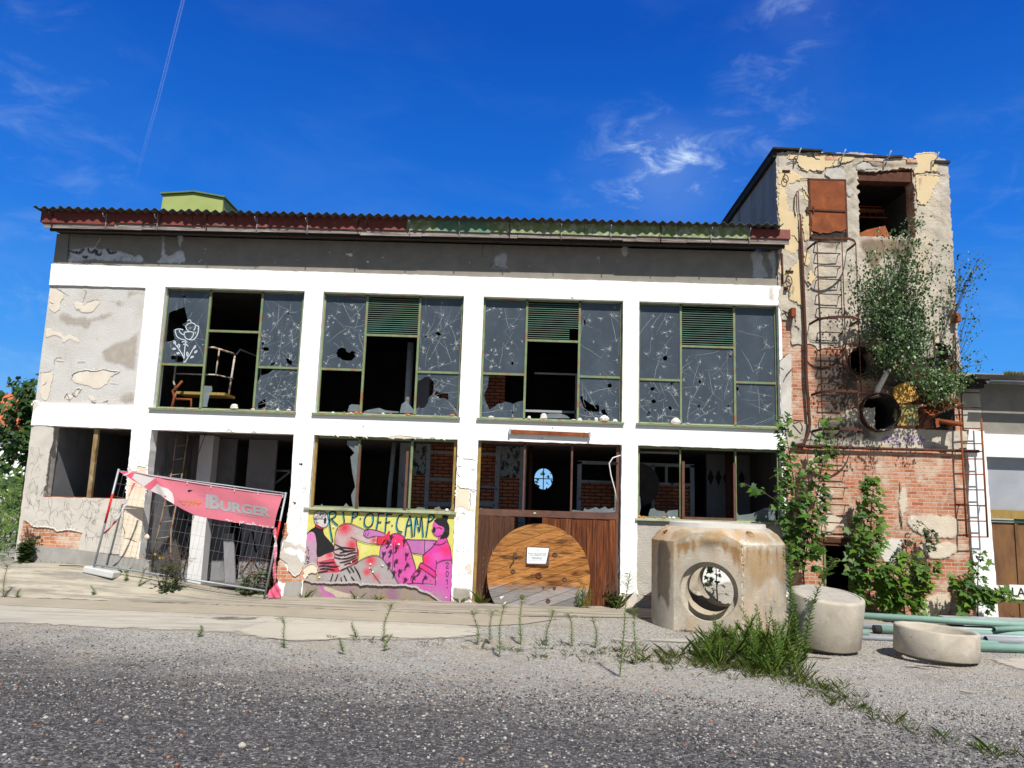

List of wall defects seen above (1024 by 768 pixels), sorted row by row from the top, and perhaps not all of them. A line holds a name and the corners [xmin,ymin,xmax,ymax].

peeling [914,152,940,205]
peeling [777,152,855,308]
flaking render [49,289,99,313]
flaking render [45,328,79,343]
flaking render [31,359,63,411]
flaking render [66,368,120,401]
flaking render [20,519,83,549]
peeling [277,504,320,583]